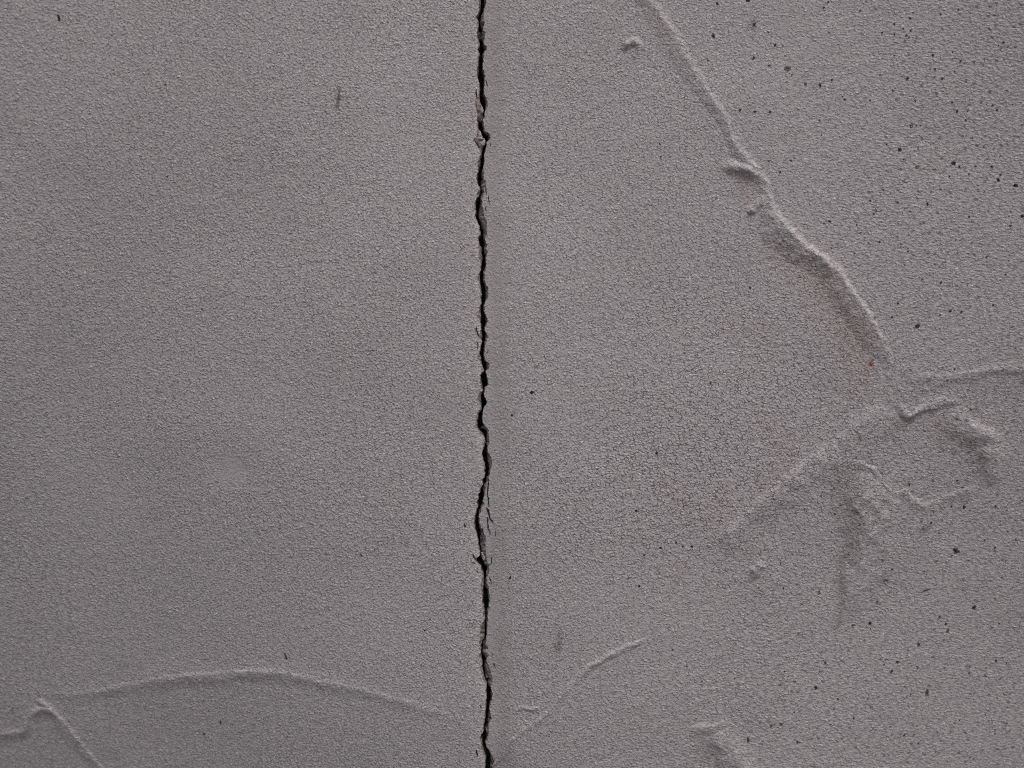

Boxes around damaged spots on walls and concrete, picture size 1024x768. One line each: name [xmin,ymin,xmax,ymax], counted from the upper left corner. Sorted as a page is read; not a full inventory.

crack [473,0,496,768]